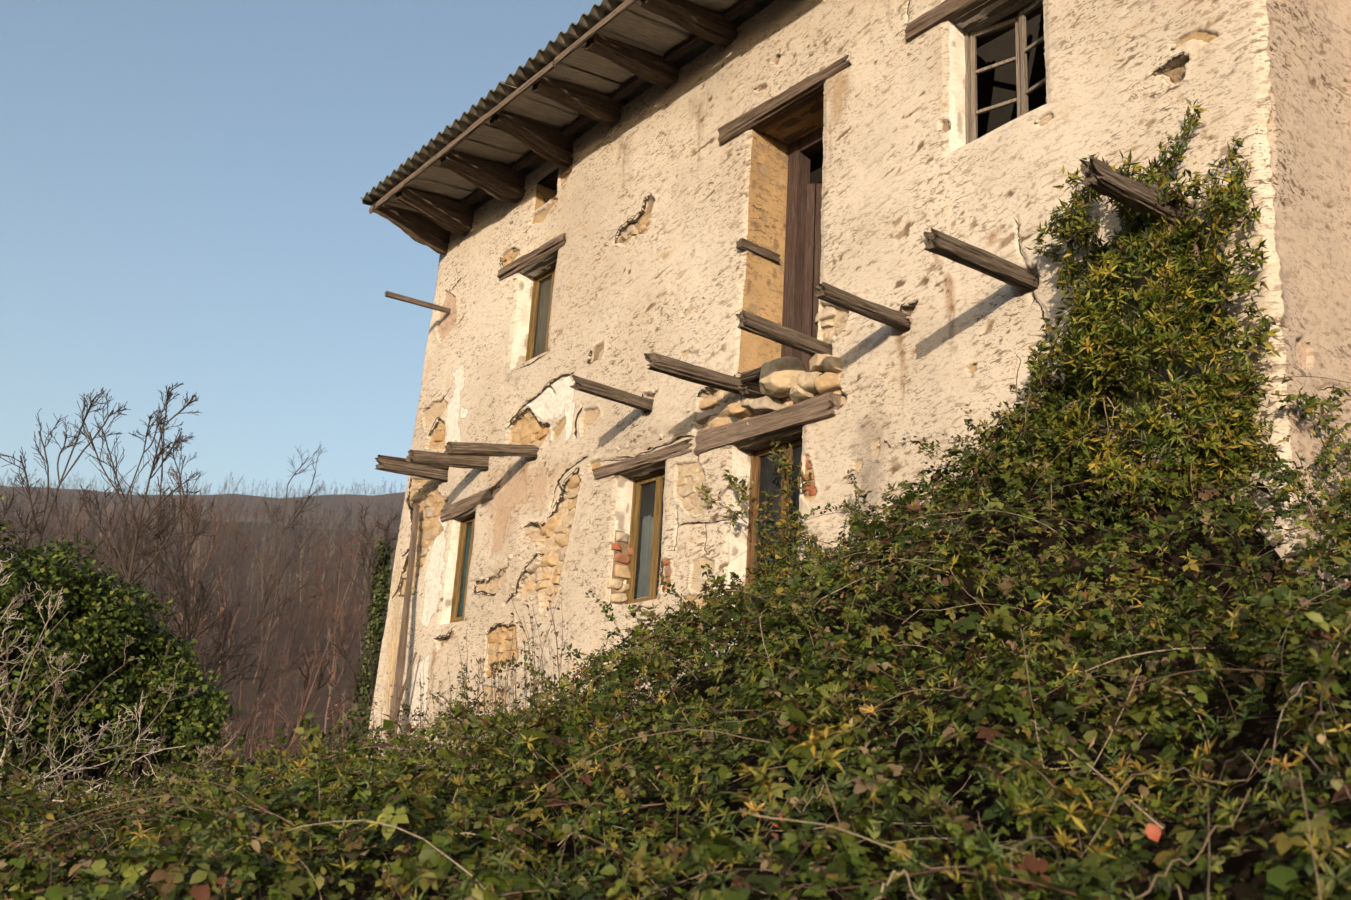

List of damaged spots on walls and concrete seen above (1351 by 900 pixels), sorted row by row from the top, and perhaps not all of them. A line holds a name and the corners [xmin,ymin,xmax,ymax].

spalling [1151,31,1218,84]
flaking render [614,192,655,247]
flaking render [686,305,849,430]
peeling [504,376,600,450]
flaking render [676,462,711,516]
flaking render [398,478,454,728]
flaking render [473,461,601,617]
flaking render [607,530,634,605]
flaking render [479,619,520,714]